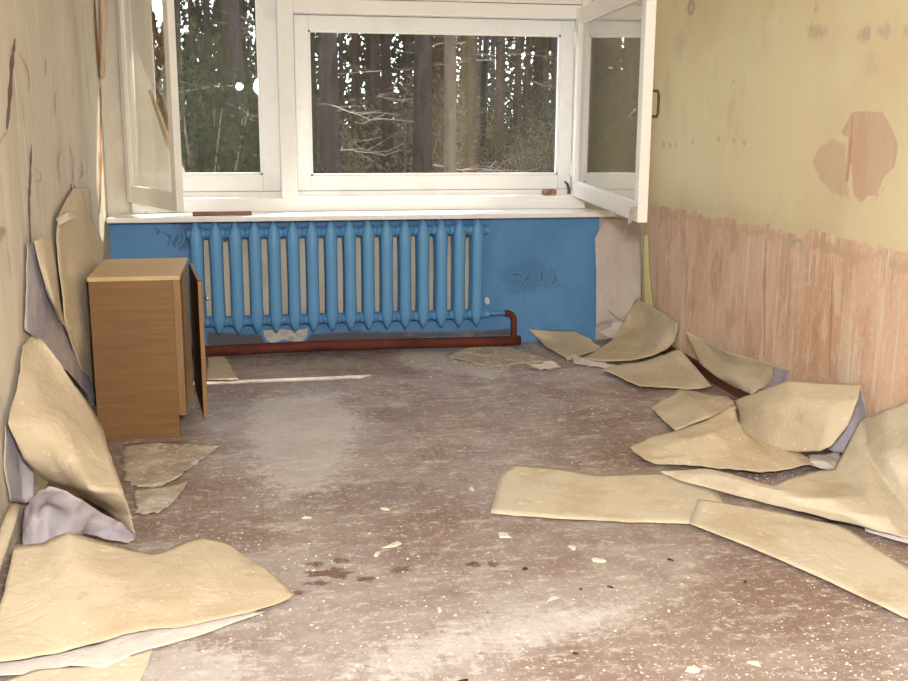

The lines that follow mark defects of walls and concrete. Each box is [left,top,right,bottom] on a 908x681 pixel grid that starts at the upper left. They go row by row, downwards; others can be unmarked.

peeling [808,109,899,208]